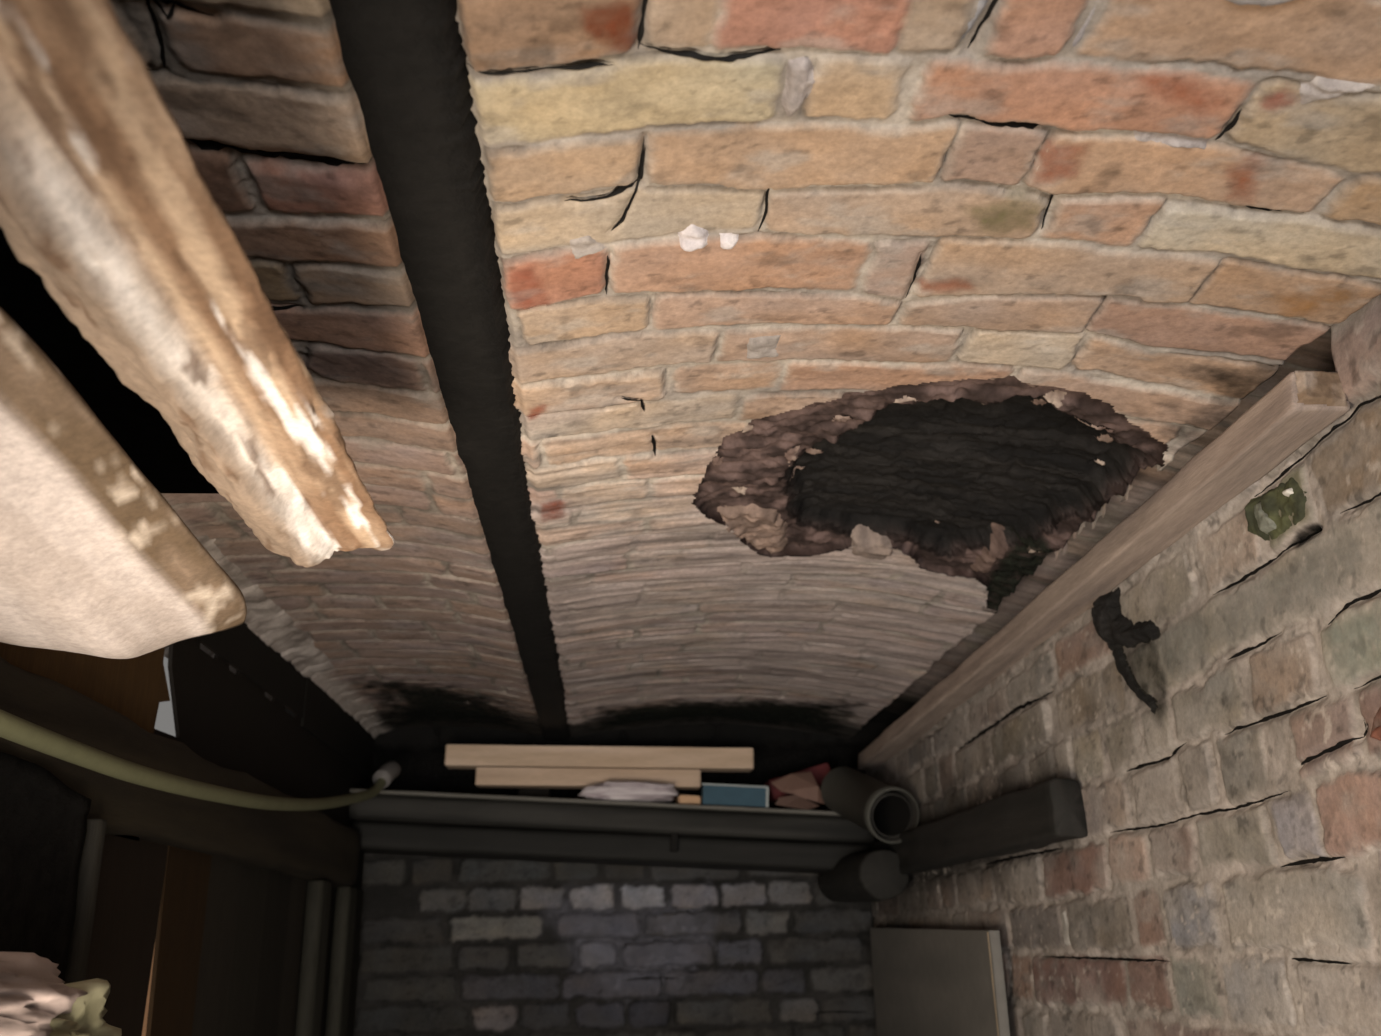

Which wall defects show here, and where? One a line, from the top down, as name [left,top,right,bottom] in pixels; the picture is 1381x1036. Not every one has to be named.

crack [968,0,998,48]
crack [565,139,645,294]
spalling [691,375,1169,614]
crack [1228,633,1280,660]
damp [366,681,514,726]
damp [594,700,863,735]
crack [959,691,1053,750]
crack [1225,675,1381,735]
crack [1110,722,1368,833]